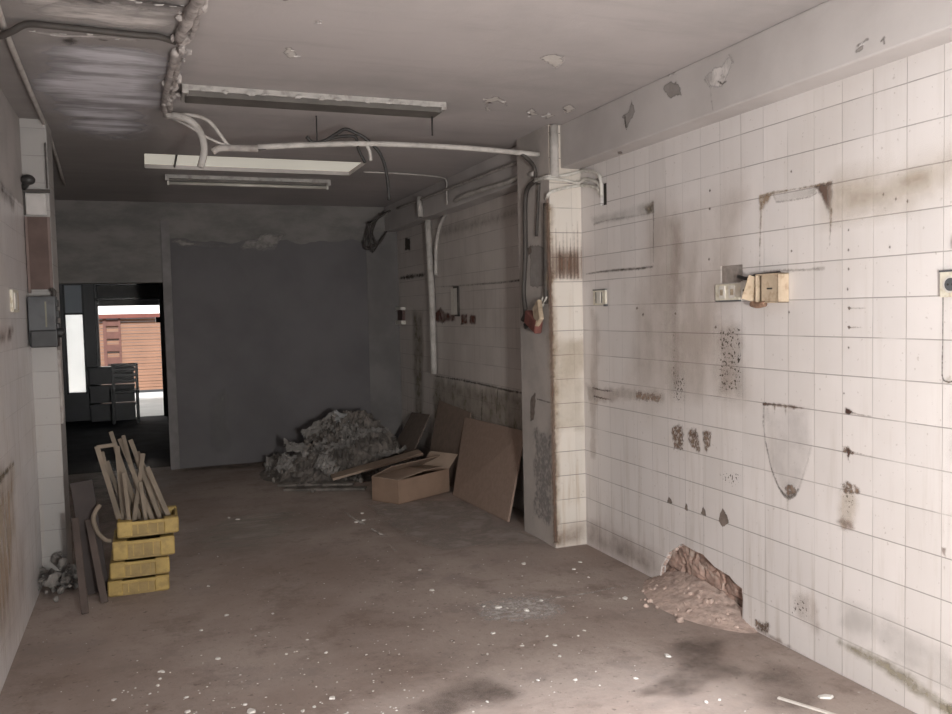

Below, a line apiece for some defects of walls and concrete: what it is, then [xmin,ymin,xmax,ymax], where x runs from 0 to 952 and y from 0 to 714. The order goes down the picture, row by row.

peeling [623,102,635,129]
peeling [664,72,681,98]
corrosion [546,199,579,543]
mould [719,329,741,390]
damp [771,468,796,499]
flaking render [665,546,743,607]